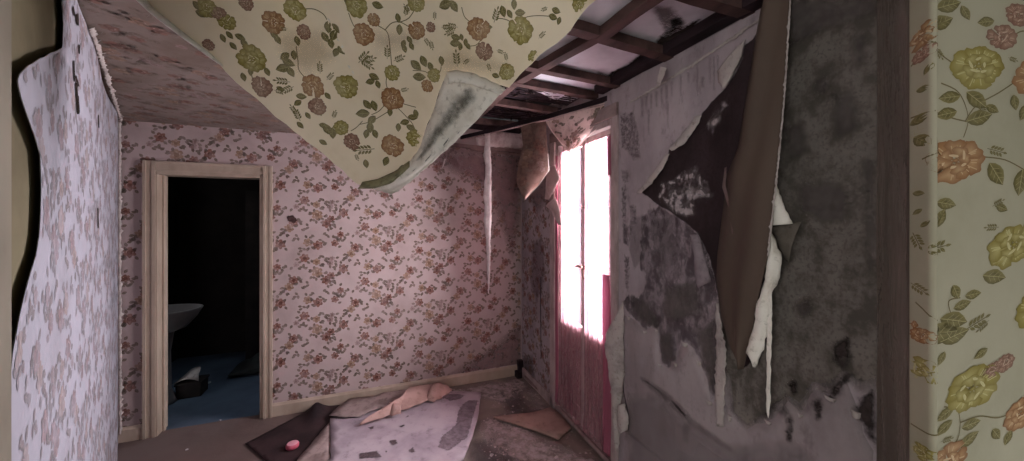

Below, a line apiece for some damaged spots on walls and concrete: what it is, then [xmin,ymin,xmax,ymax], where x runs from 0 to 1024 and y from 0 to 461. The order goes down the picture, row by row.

peeling [89,28,124,435]
damp [420,91,550,239]
damp [624,0,907,461]